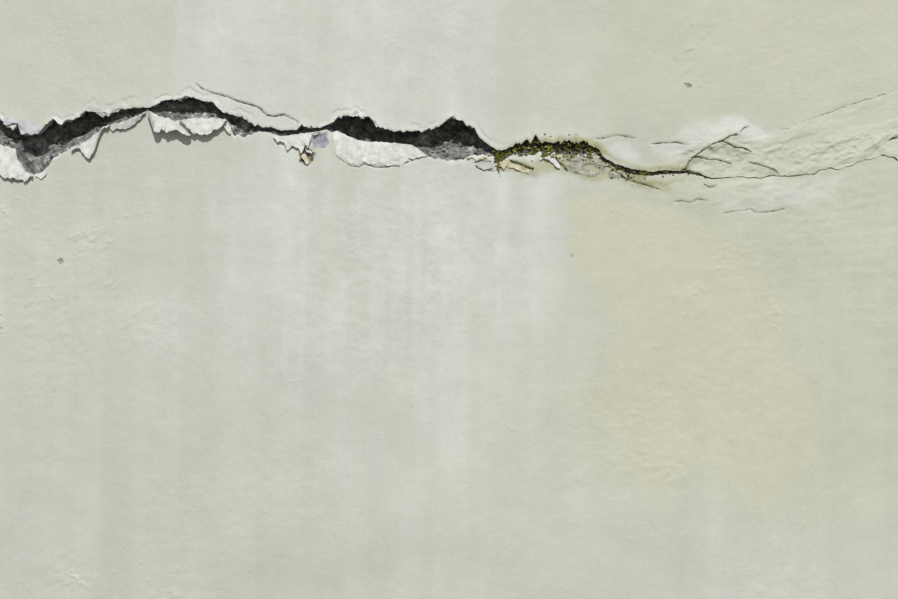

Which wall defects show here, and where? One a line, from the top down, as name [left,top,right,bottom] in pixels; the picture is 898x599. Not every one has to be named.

peeling [272,131,329,167]
crack [0,86,785,202]
water stain [60,0,674,590]